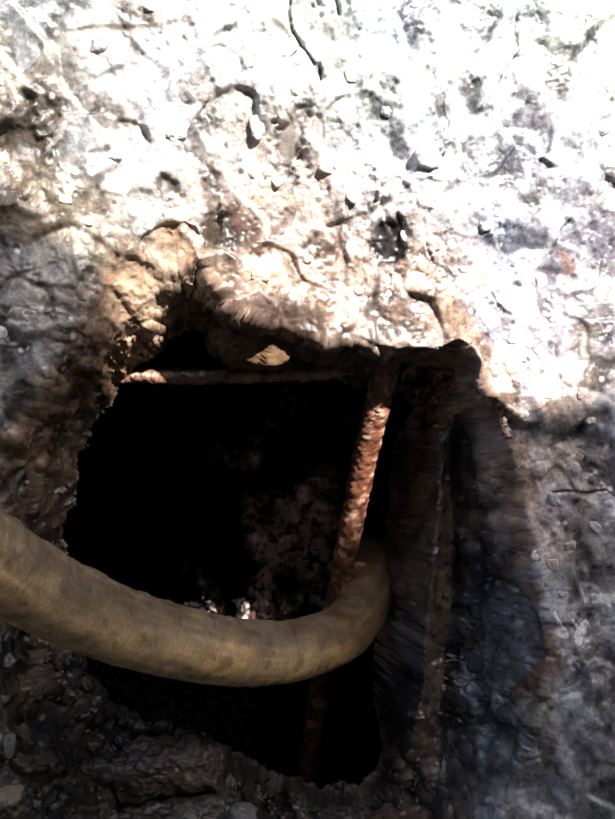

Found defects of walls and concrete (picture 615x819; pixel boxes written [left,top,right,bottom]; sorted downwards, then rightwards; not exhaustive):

peeling [0,0,50,74]
crack [288,2,322,81]
crack [498,19,521,84]
spalling [0,106,66,185]
spalling [192,211,230,250]
rust [225,202,303,284]
spalling [368,216,411,278]
rust [211,242,362,341]
rust [377,243,541,602]
rust [114,360,401,610]
peeling [552,611,589,648]
rust [514,629,565,742]